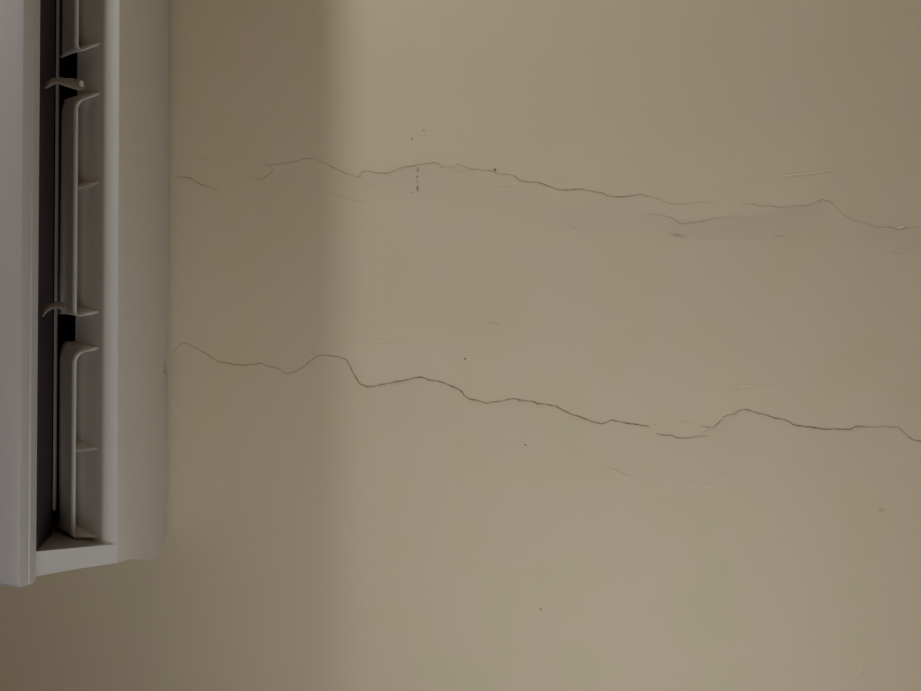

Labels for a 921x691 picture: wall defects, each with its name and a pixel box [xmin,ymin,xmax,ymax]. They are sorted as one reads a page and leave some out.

crack [350,367,720,438]
crack [739,409,858,430]